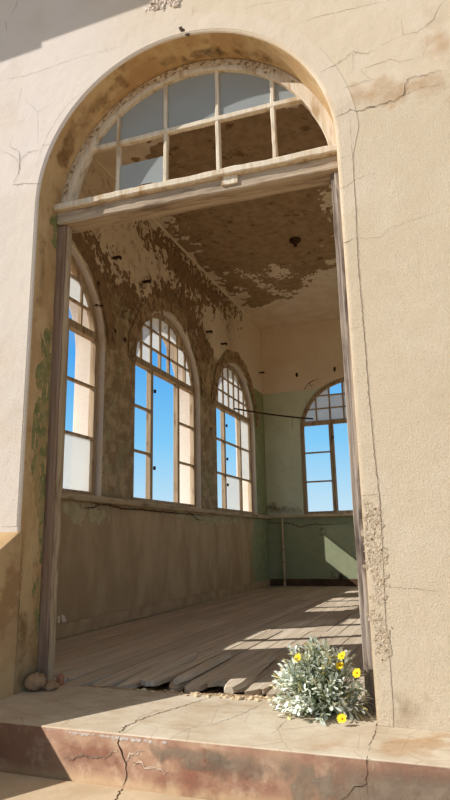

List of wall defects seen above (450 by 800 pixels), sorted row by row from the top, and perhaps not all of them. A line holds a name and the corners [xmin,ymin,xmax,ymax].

spalling [145,0,181,14]
peeling [131,104,328,180]
peeling [72,184,338,428]
crack [82,502,212,521]
spalling [361,498,393,665]
crack [70,698,261,800]
crack [343,722,394,799]